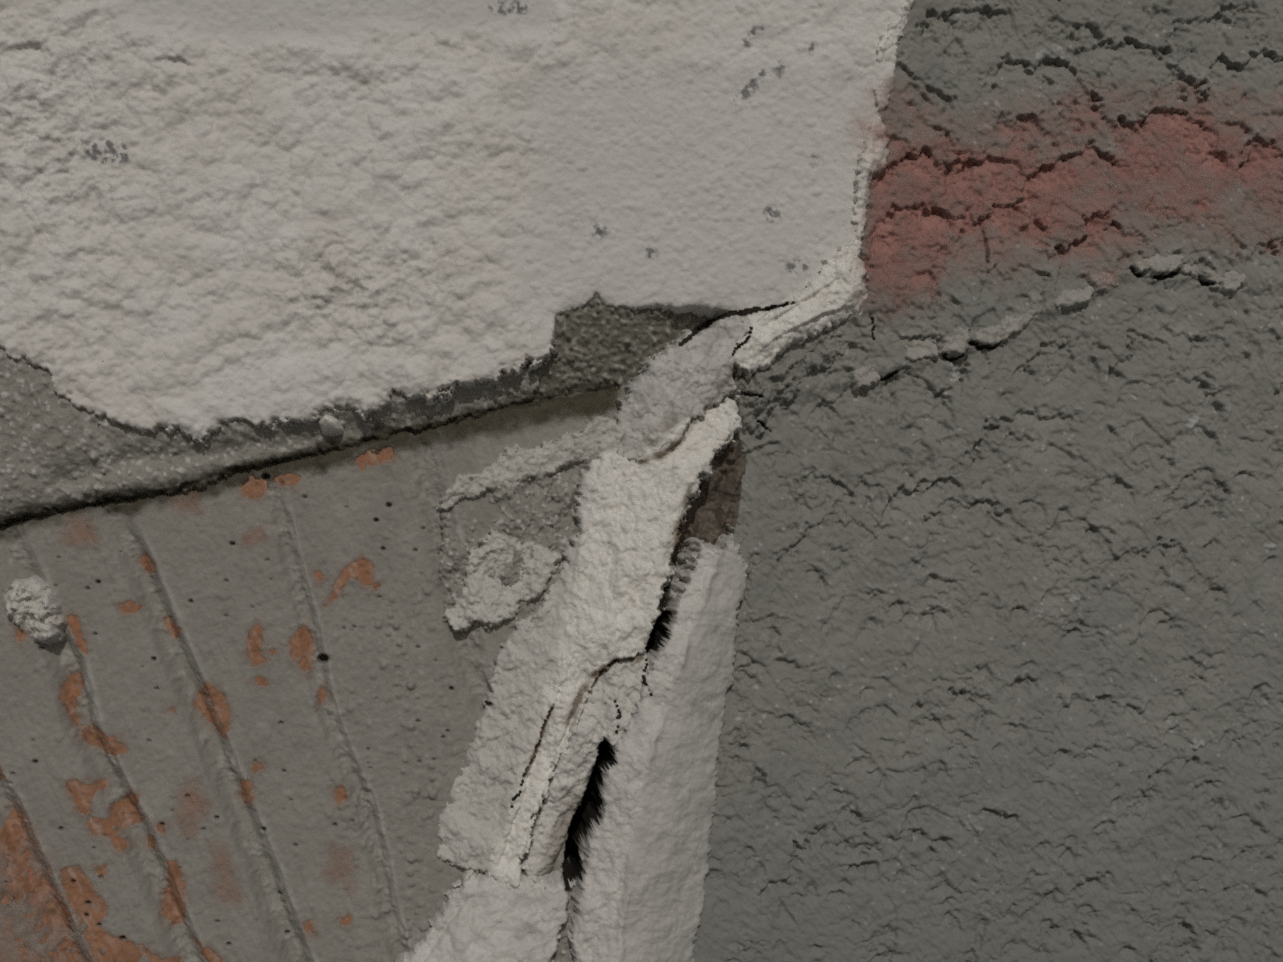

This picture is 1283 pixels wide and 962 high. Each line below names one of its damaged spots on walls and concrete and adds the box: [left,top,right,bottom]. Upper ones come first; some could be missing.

crack [678,301,795,356]
crack [405,387,621,433]
crack [741,391,768,430]
crack [4,496,112,525]
crack [159,481,201,490]
peeling [0,0,910,962]
crack [642,610,672,696]
crack [562,700,622,892]